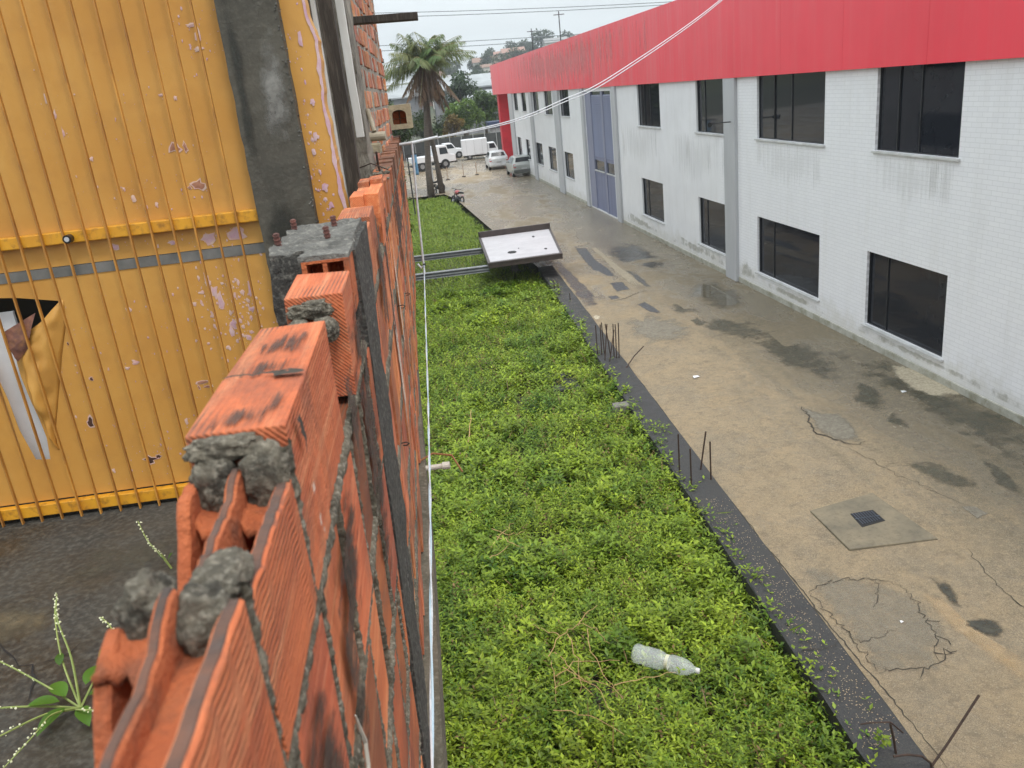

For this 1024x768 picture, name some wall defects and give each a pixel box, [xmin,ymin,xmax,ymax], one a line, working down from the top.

peeling [172,6,215,60]
peeling [176,168,213,198]
peeling [288,0,347,239]
peeling [145,227,278,362]
crack [742,514,955,766]